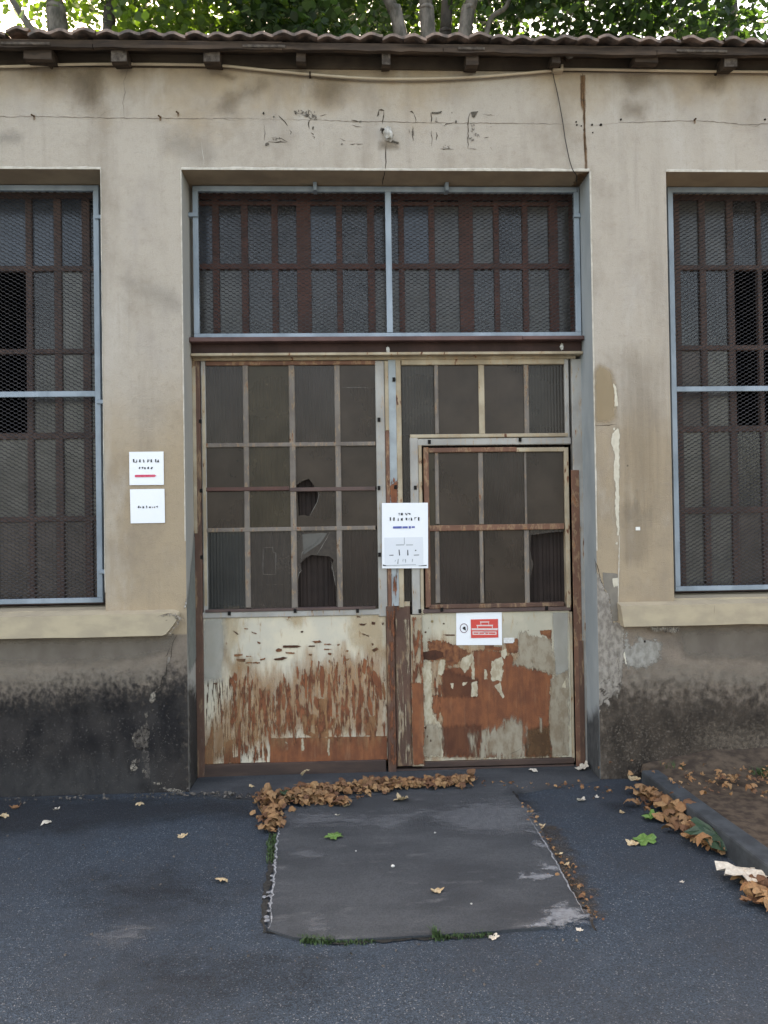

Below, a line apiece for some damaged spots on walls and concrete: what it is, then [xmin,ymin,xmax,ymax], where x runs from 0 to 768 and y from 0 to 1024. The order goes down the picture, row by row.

rust [390,478,398,503]
flaking render [597,428,680,713]
damp [0,533,224,798]
peeling [234,640,351,664]
rust [205,574,399,765]
peeling [396,617,567,765]
rust [423,623,552,758]
damp [587,684,768,779]